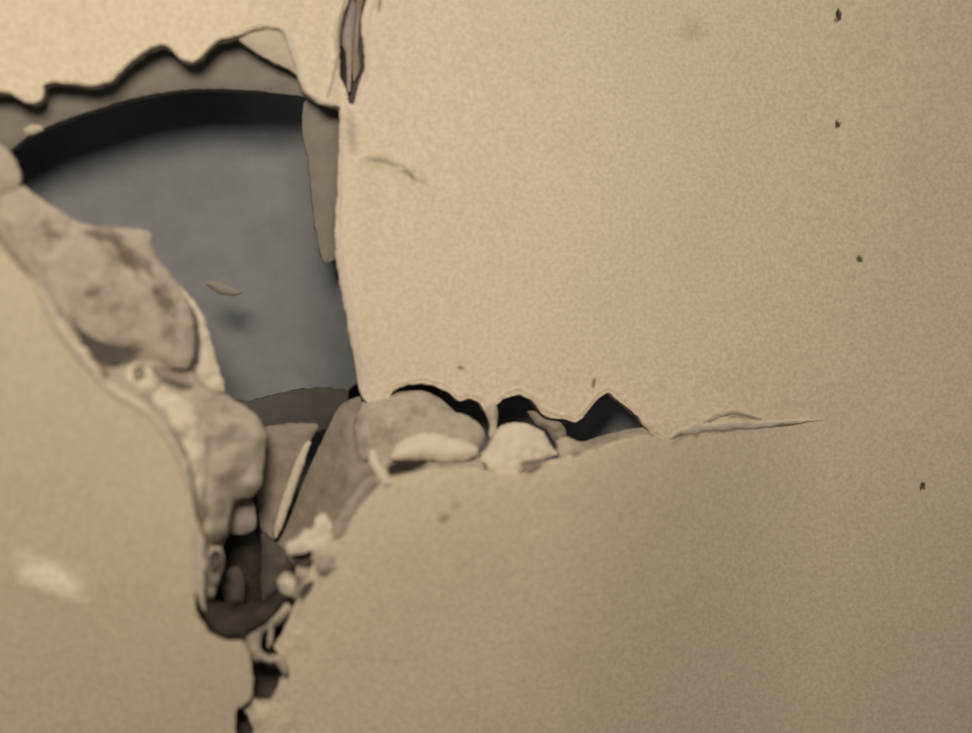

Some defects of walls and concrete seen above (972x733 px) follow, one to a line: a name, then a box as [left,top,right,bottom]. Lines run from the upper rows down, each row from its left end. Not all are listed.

crack [327,0,376,105]
spalling [0,23,382,637]
crack [332,376,824,540]